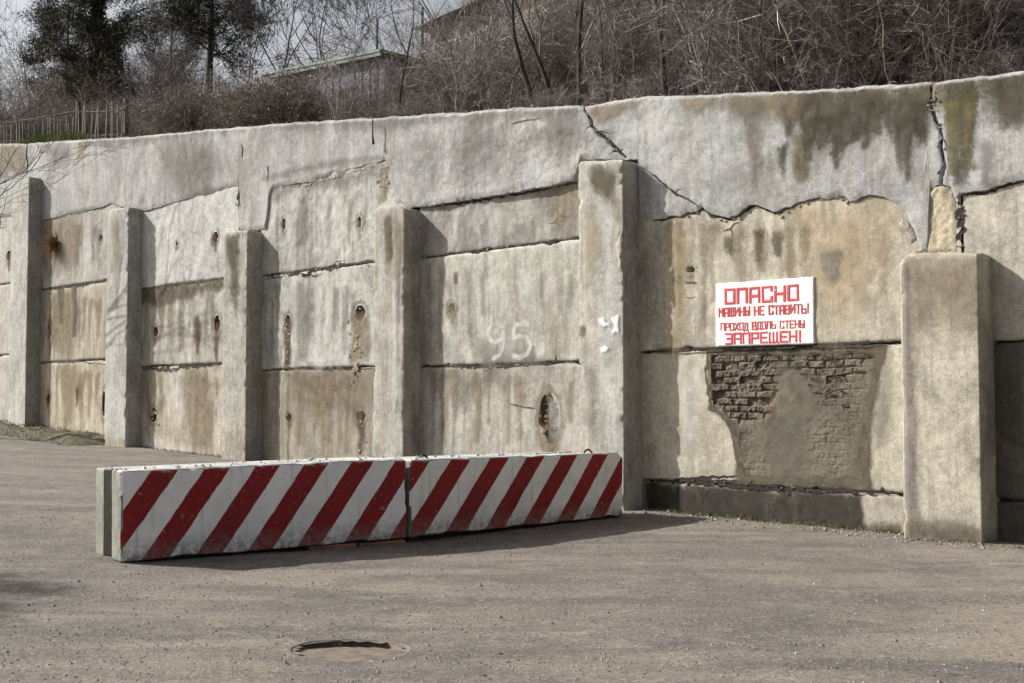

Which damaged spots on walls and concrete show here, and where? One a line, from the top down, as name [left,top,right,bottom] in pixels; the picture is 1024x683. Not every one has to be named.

crack [584,107,875,239]
water stain [745,86,929,180]
crack [927,82,1024,248]
water stain [945,73,1024,186]
spalling [345,296,373,386]
flaking render [704,344,886,488]